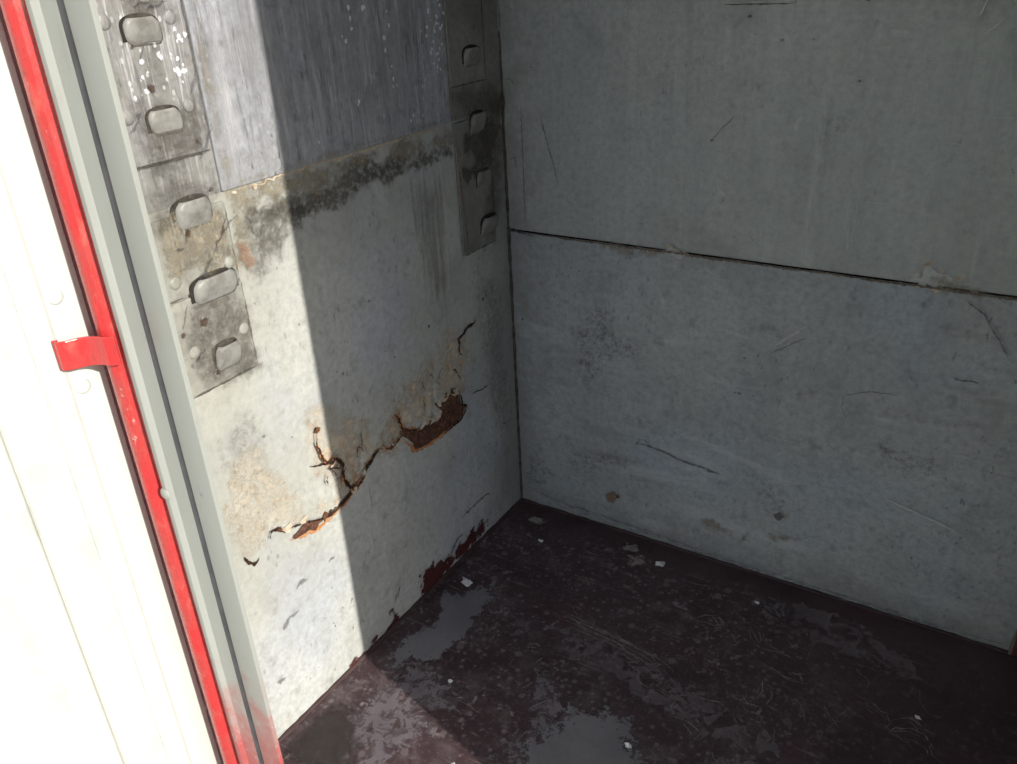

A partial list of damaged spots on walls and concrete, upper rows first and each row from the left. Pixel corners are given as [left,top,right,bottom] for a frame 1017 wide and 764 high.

leakage [200,148,452,278]
spalling [400,387,467,453]
rust [317,418,372,502]
spalling [292,477,362,540]
leakage [284,707,358,764]